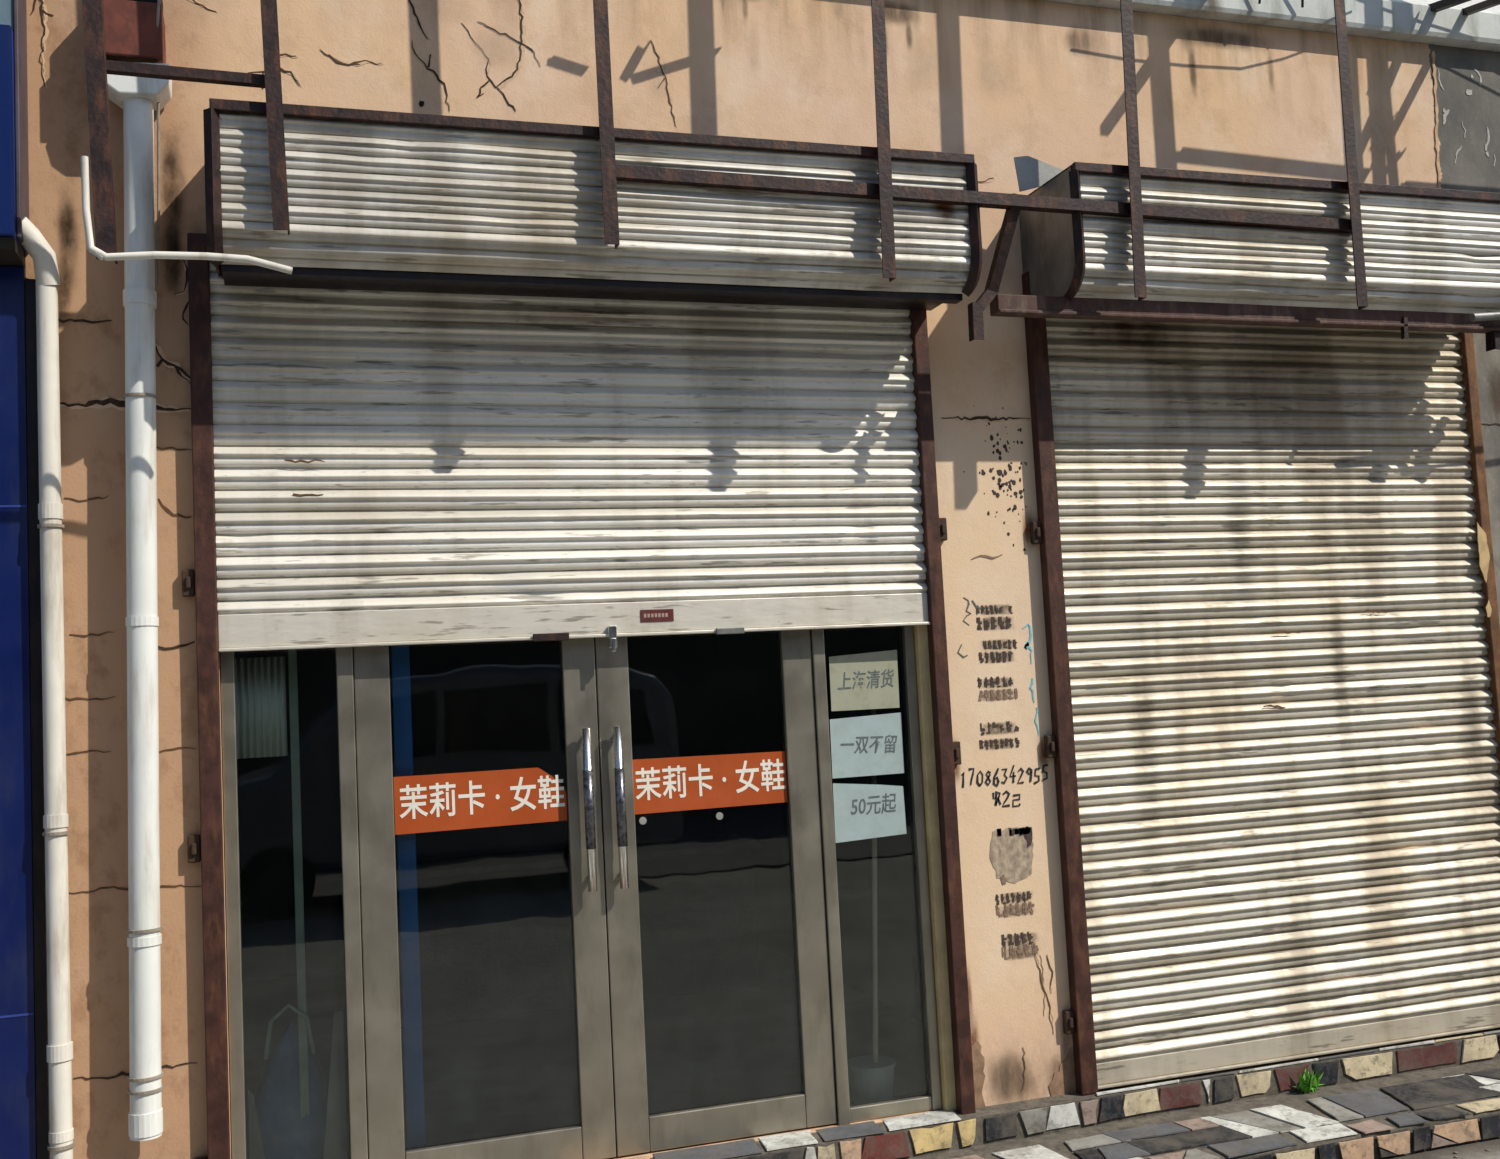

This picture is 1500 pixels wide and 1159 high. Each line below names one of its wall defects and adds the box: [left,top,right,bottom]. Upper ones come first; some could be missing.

crack [31,0,54,88]
crack [248,0,541,111]
crack [651,41,677,127]
flaking render [1431,51,1466,188]
corrosion [936,203,953,216]
crack [942,415,1031,423]
crack [70,630,114,638]
crack [158,641,195,650]
crack [65,694,116,702]
crack [66,748,111,756]
crack [69,884,200,894]
crack [73,1063,190,1080]